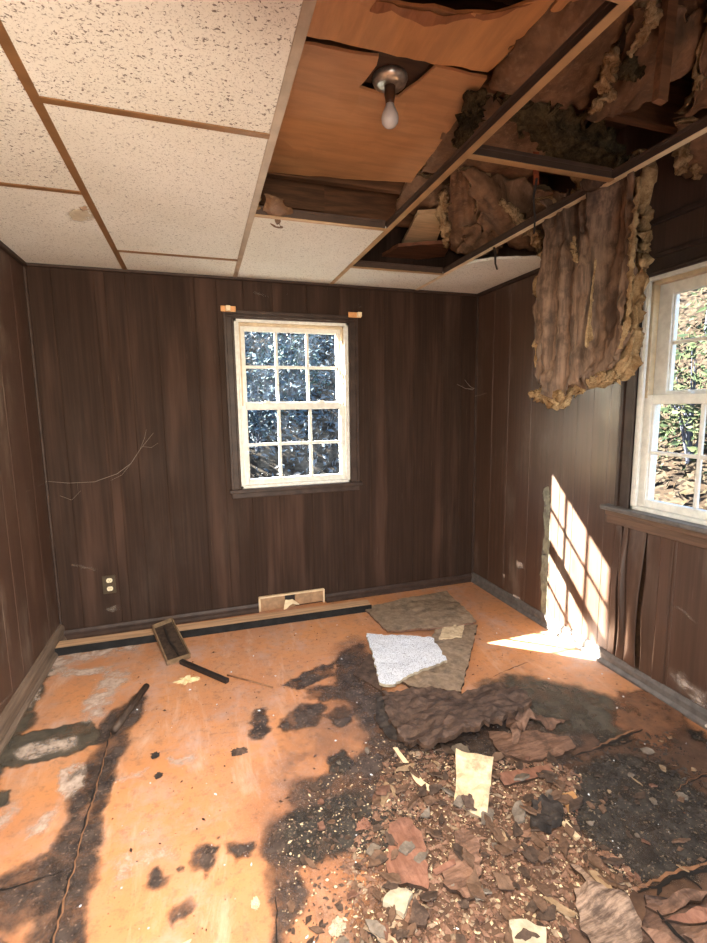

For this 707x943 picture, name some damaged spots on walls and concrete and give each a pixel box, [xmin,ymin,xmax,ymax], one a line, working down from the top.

peeling [263,194,293,228]
damp [0,645,146,943]
damp [177,644,707,943]
damp [145,859,167,889]
damp [170,904,193,923]